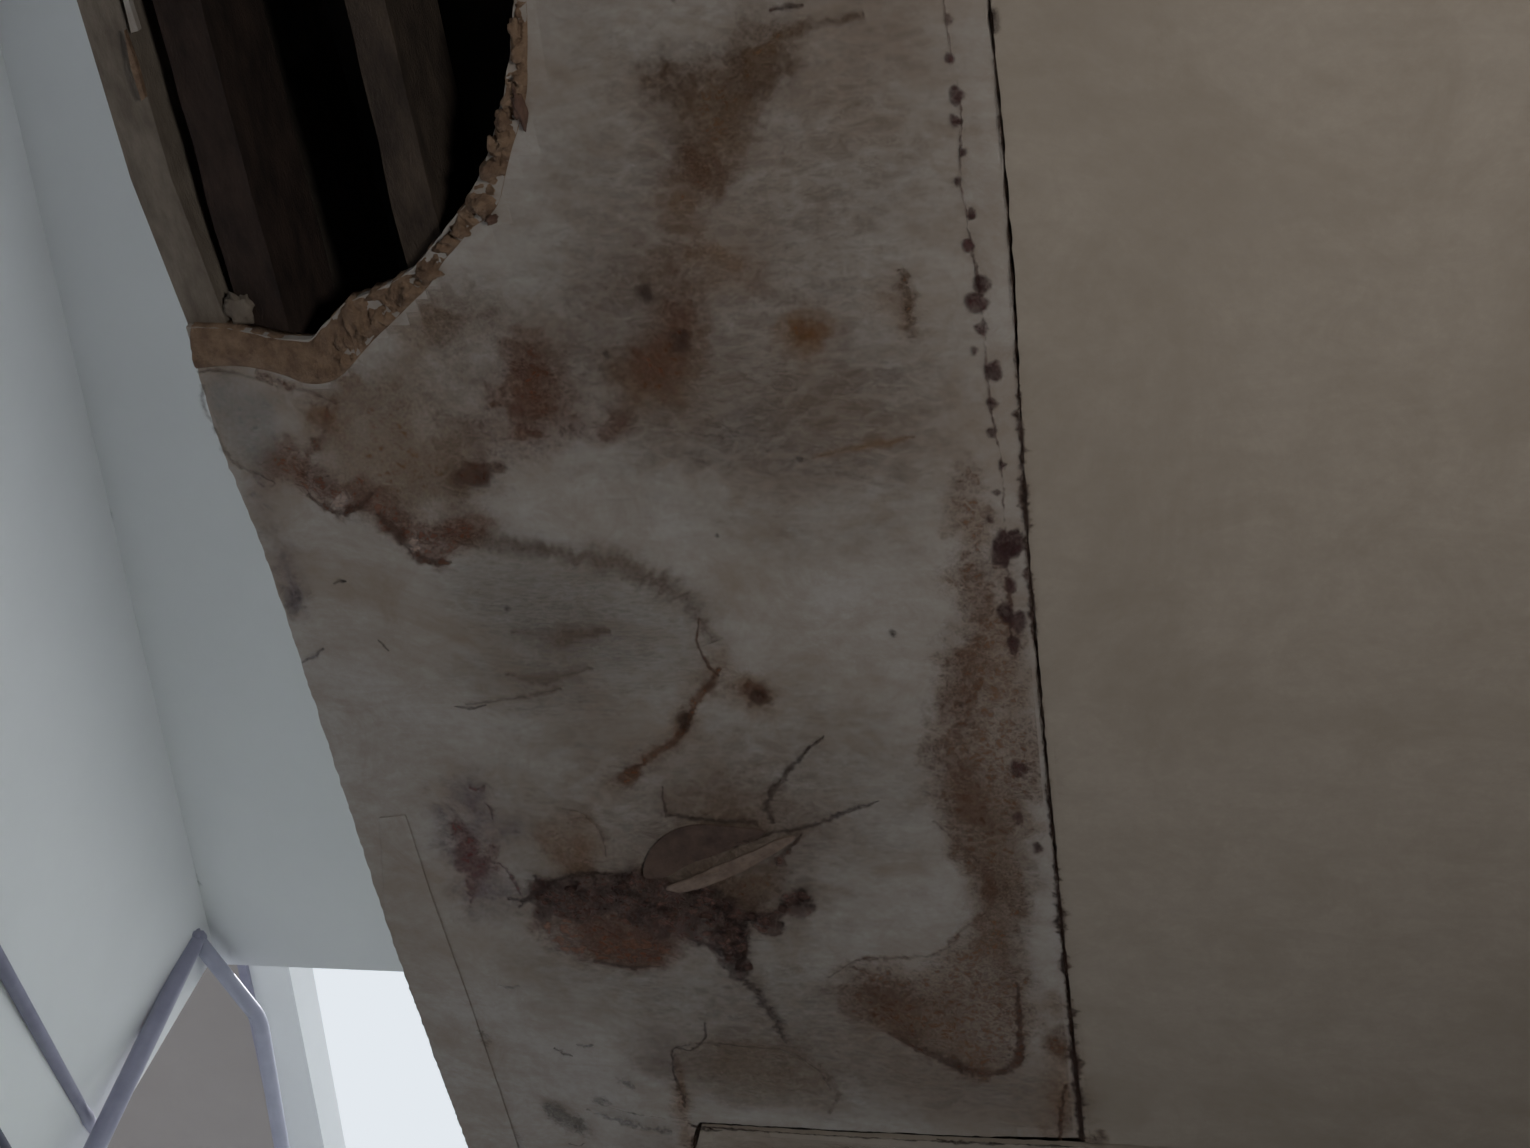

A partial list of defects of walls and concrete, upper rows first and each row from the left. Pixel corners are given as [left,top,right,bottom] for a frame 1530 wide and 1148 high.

spalling [190,0,529,384]
leakage [642,4,810,207]
leakage [950,86,1026,655]
crack [617,618,721,785]
peeling [507,736,878,1043]